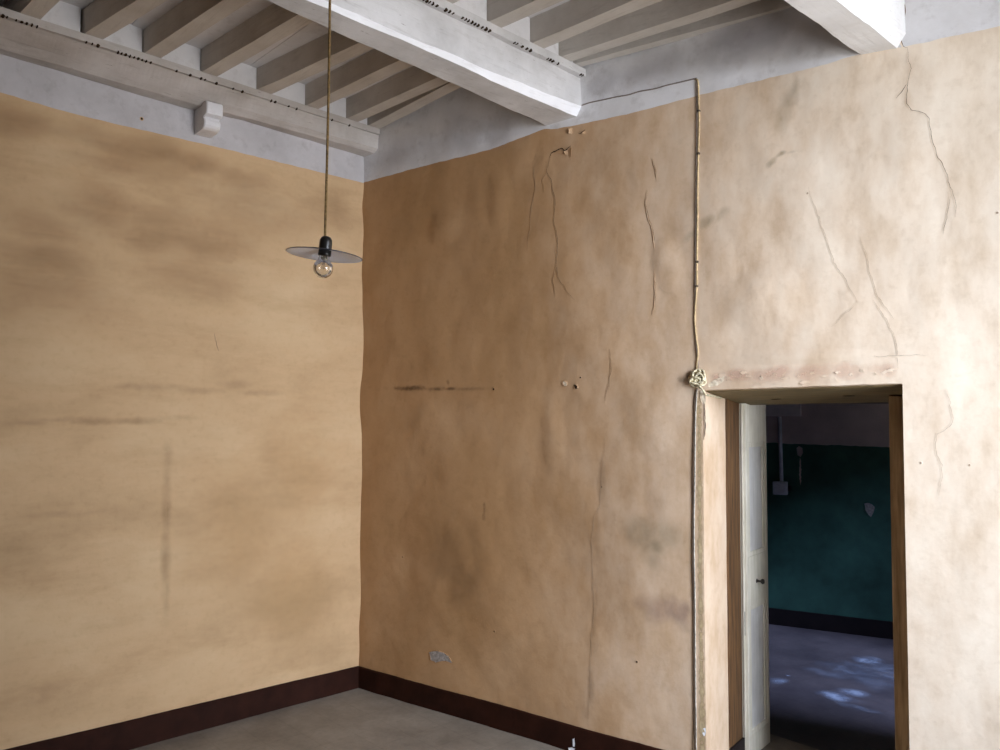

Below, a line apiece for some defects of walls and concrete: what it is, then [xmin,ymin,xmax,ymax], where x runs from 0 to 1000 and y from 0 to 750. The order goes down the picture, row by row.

crack [895,41,956,234]
crack [526,156,574,300]
crack [644,158,657,316]
crack [807,187,928,369]
crack [603,349,611,402]
peeling [700,368,898,405]
crack [933,390,953,495]
crack [587,440,605,719]